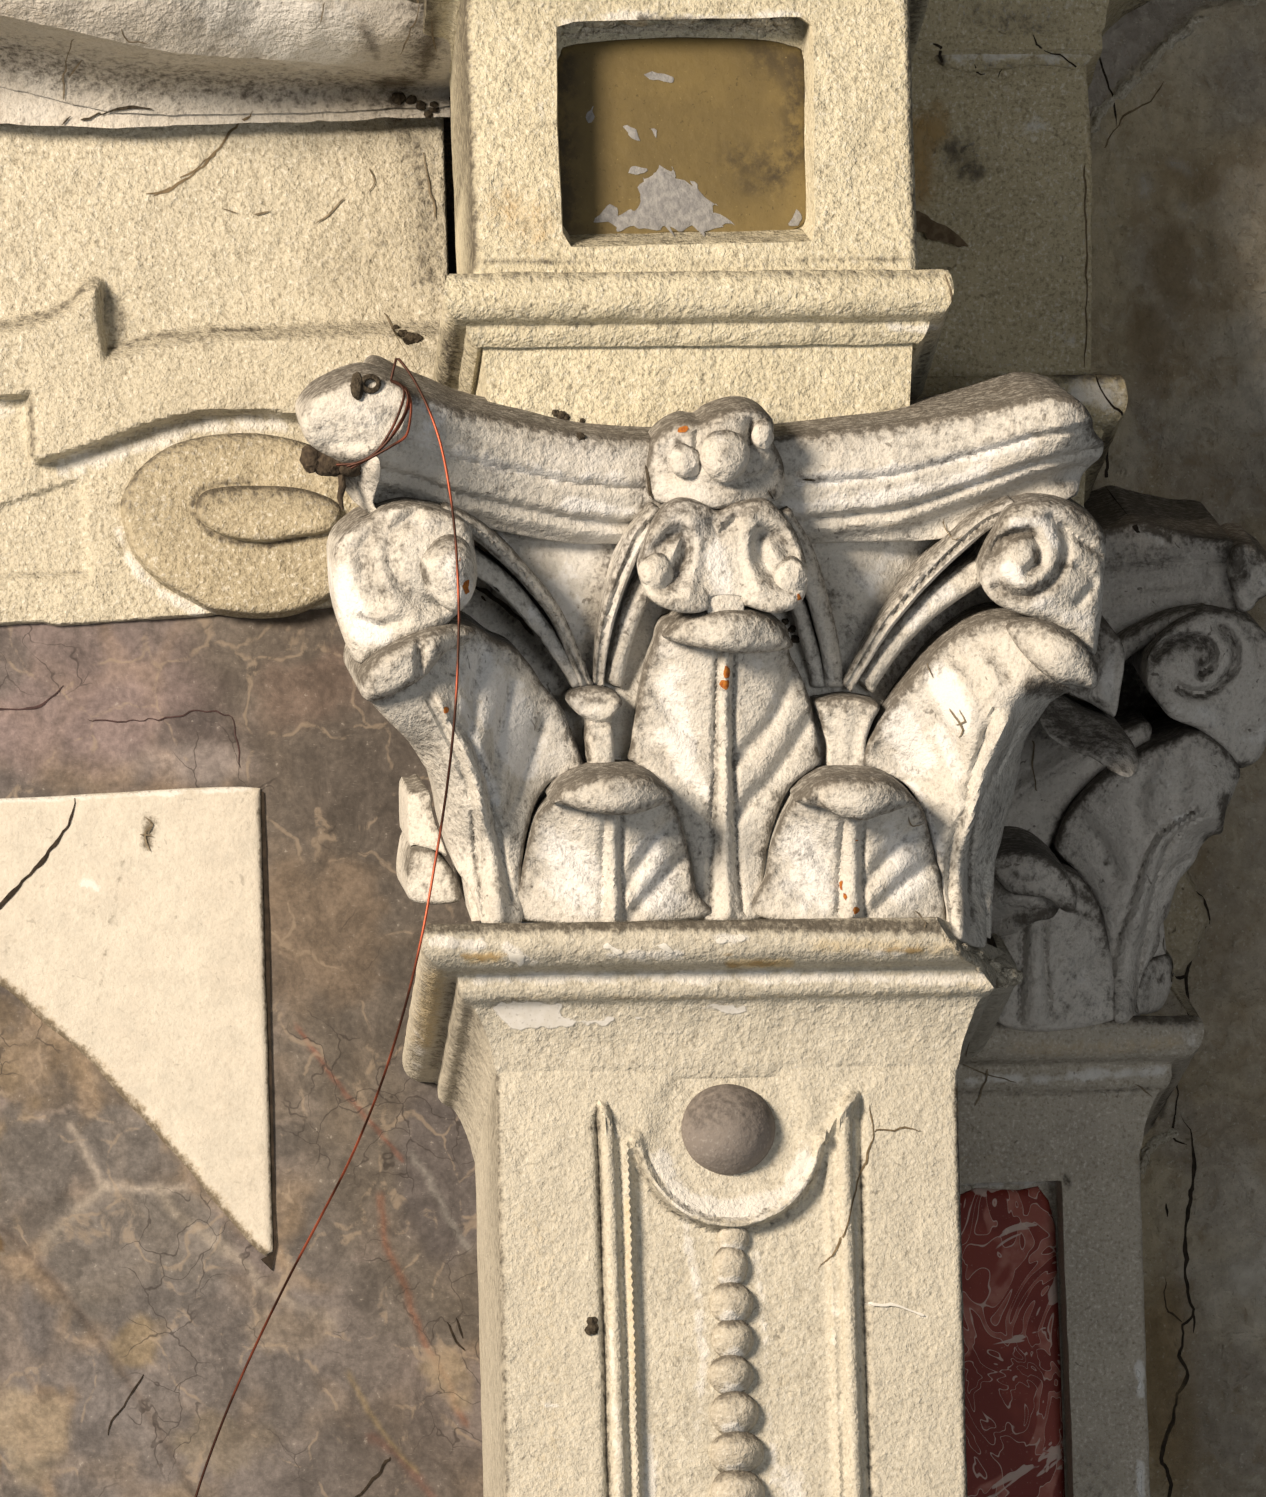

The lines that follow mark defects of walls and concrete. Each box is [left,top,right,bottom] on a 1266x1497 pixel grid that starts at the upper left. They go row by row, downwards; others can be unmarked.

peeling [644,71,674,83]
crack [147,112,252,196]
peeling [623,125,657,141]
peeling [594,165,733,243]
peeling [788,209,802,226]
crack [1033,35,1164,416]
crack [0,686,63,710]
crack [88,710,240,766]
crack [0,798,76,909]
crack [1170,891,1211,1015]
crack [818,1105,918,1269]
crack [1159,1085,1197,1497]